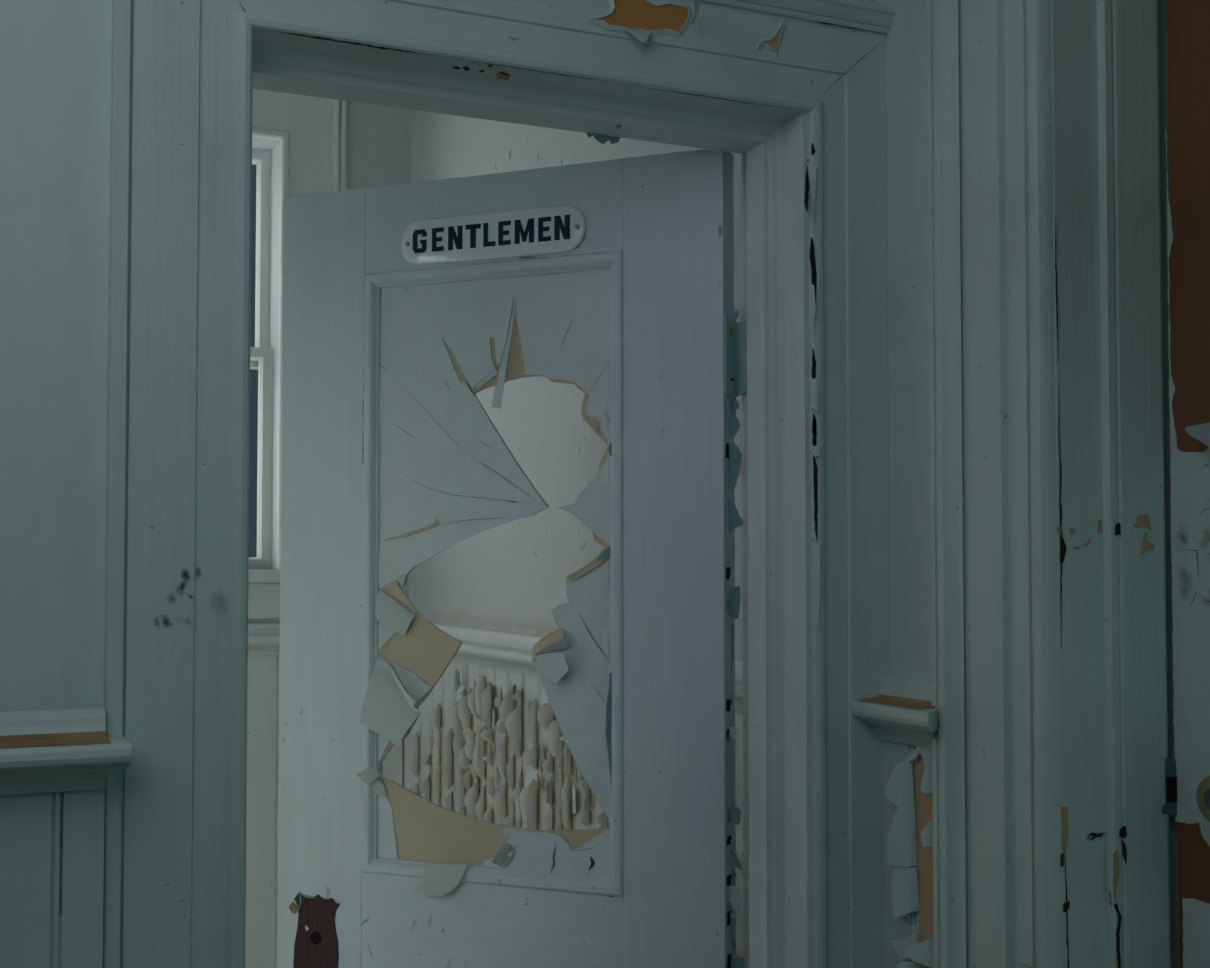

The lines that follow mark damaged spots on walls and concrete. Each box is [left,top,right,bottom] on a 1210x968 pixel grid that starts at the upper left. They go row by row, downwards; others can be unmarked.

peeling [586,0,702,43]
peeling [725,395,743,531]
crack [1054,220,1062,648]
peeling [726,567,741,711]
peeling [409,668,609,830]
peeling [726,807,745,968]
peeling [885,746,934,968]
crack [1063,856,1071,968]